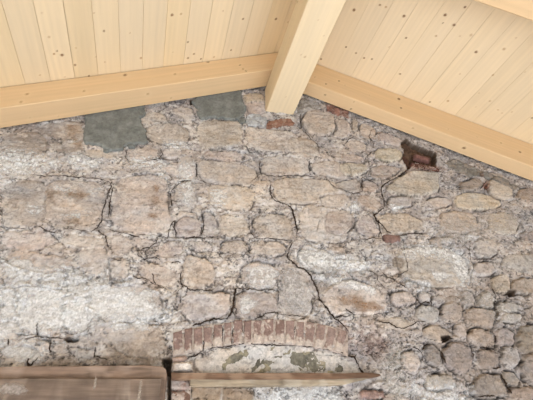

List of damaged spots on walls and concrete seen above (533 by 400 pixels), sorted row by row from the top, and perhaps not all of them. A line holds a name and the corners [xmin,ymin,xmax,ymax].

spalling [401,144,439,172]
crack [32,174,219,297]
crack [247,147,432,330]
crack [187,288,364,373]